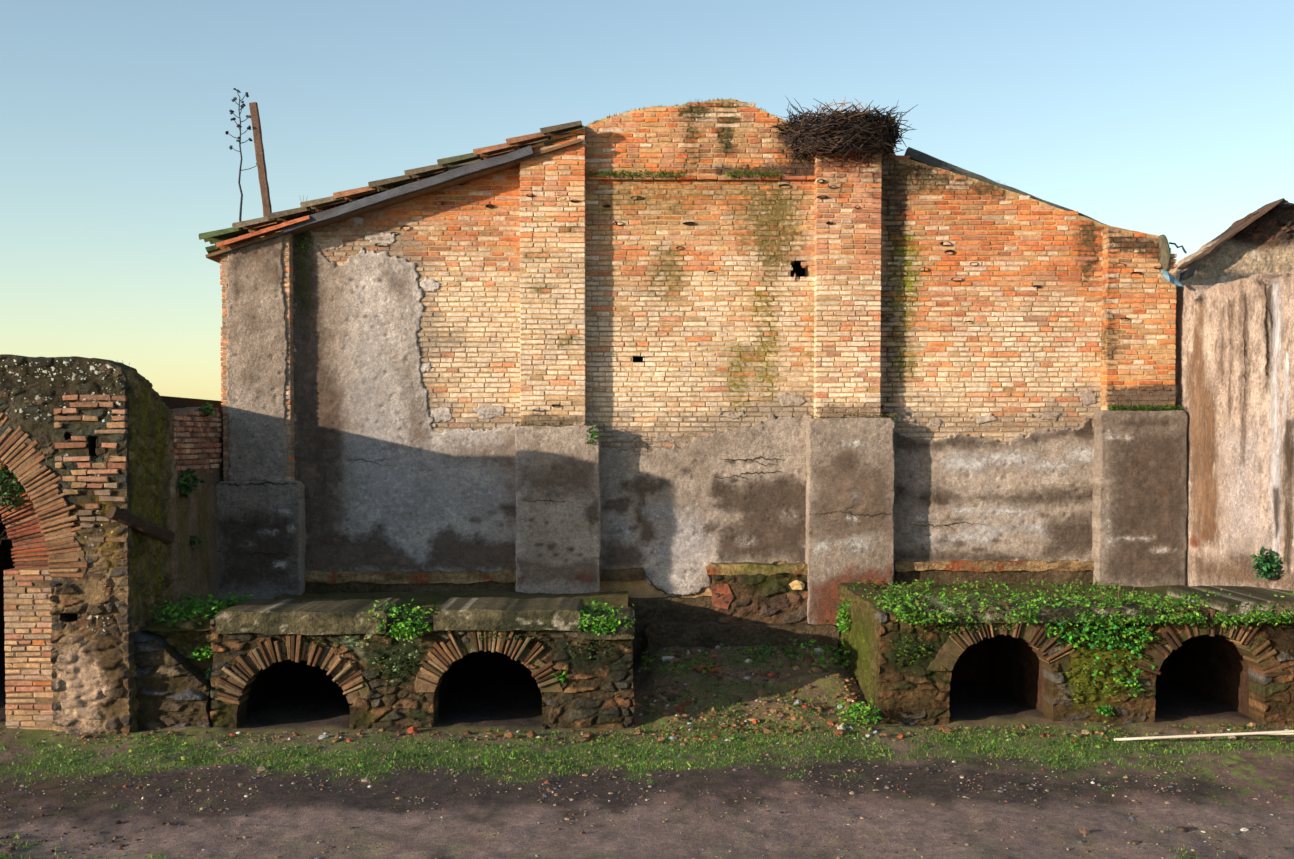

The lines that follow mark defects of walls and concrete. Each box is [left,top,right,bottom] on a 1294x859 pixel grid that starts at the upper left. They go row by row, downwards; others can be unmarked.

spalling [312,151,561,432]
leakage [177,233,904,588]
leakage [817,149,1004,419]
leakage [894,282,1294,589]
leakage [1079,223,1161,366]